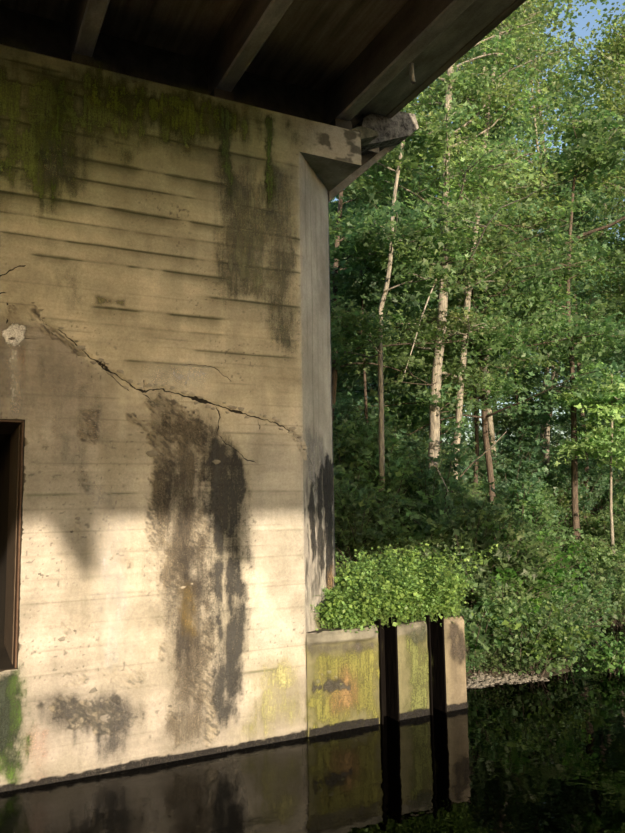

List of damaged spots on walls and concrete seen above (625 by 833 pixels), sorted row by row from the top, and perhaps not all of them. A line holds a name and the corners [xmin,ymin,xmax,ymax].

leakage [88,79,294,347]
crack [0,265,26,324]
peeling [5,301,88,358]
crack [24,320,316,476]
leakage [0,412,379,792]
spalling [34,659,150,738]
corrosion [332,667,357,710]
leakage [400,709,430,720]
leakage [447,702,468,712]